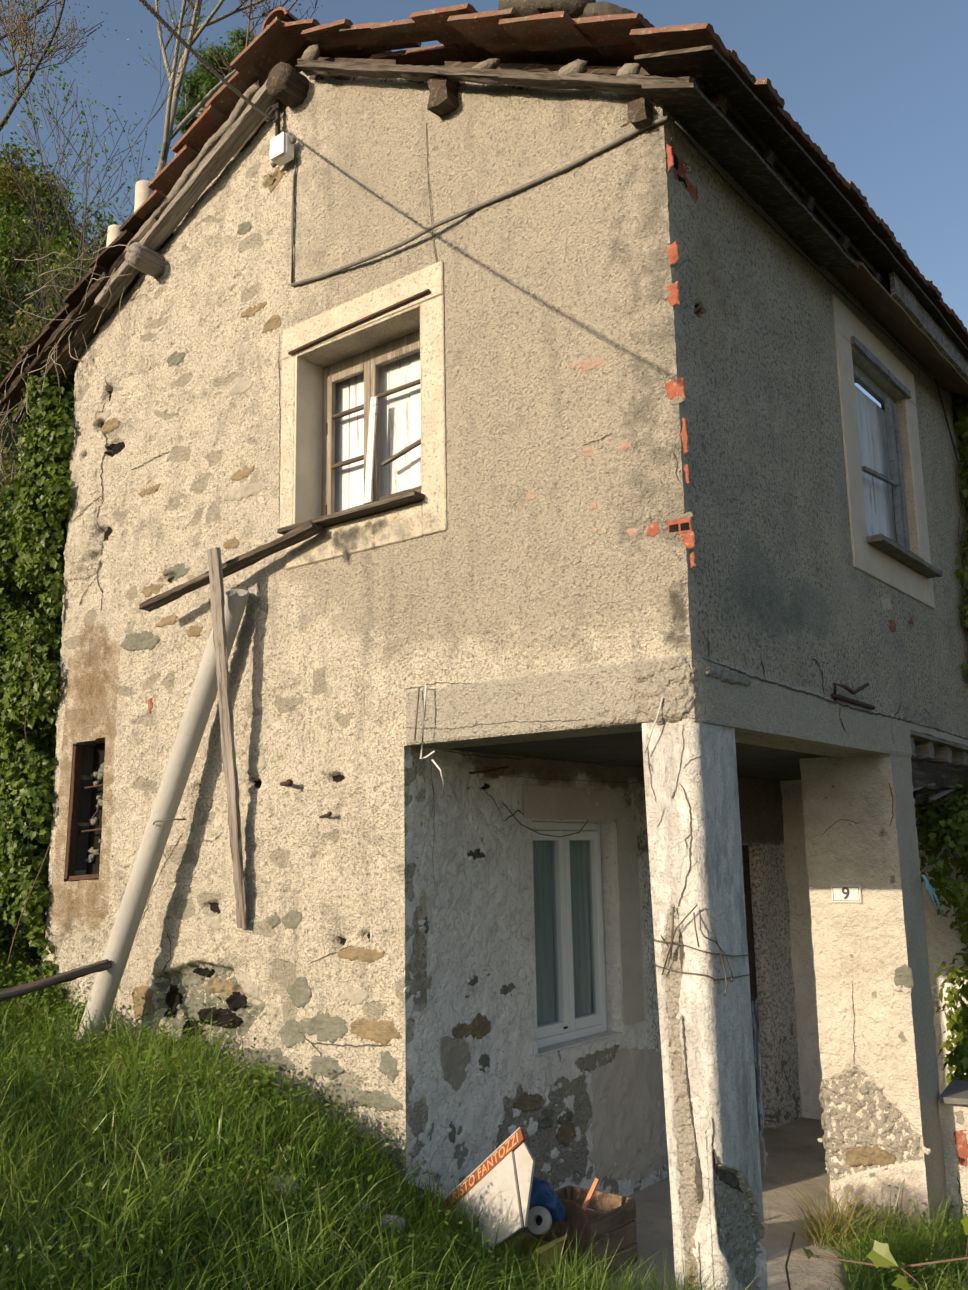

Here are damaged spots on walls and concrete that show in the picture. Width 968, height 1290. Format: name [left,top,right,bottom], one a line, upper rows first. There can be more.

flaking render [666,137,699,218]
flaking render [667,241,679,266]
flaking render [660,281,703,316]
flaking render [664,377,690,484]
spalling [582,656,751,729]
corrosion [831,683,876,710]
peeling [492,905,765,1290]
peeling [818,1066,931,1181]
flaking render [953,1127,968,1173]